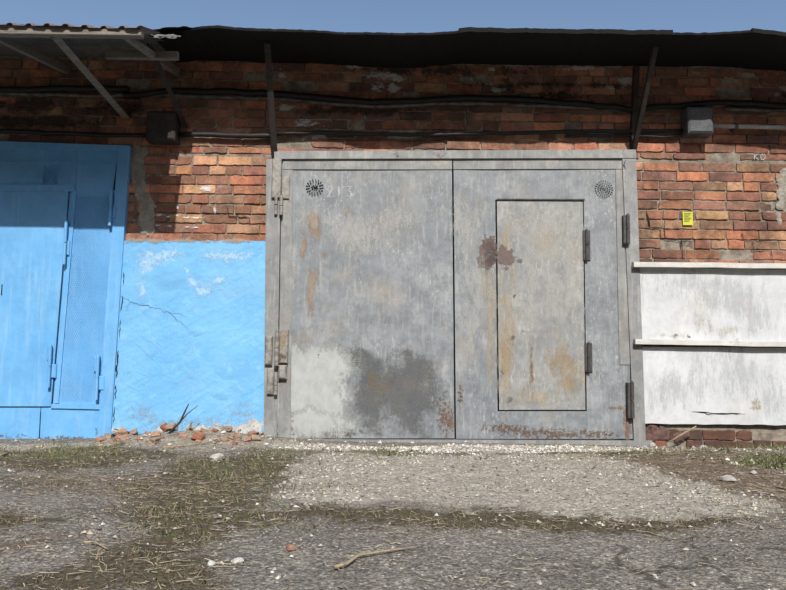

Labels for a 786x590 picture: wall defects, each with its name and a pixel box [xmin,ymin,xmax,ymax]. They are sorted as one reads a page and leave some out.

crack [113,273,190,430]
water stain [291,344,454,439]
rust [481,407,630,440]